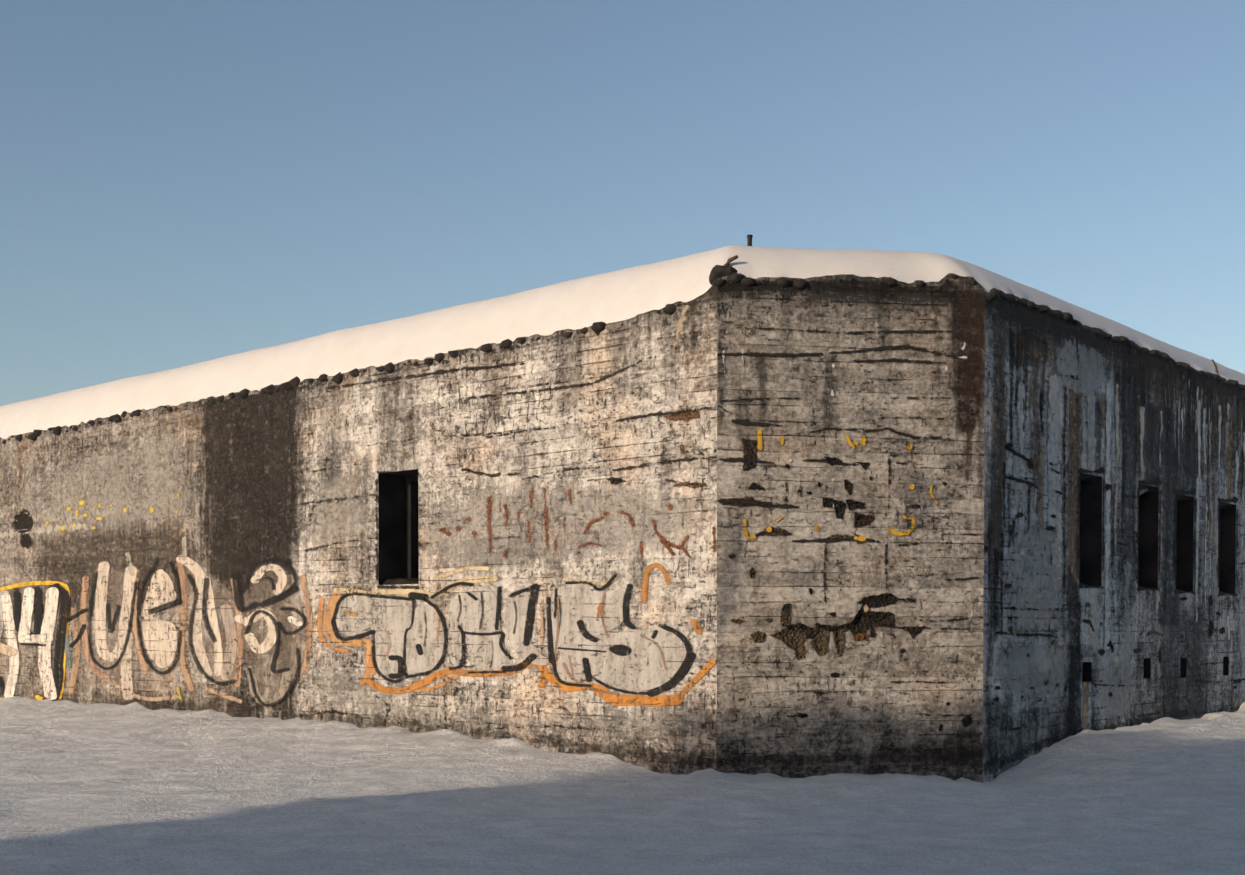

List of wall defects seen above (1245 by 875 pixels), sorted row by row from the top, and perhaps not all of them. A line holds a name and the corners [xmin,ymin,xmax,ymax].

water stain [673,305,689,351]
spalling [665,410,700,421]
water stain [0,384,309,720]
spalling [718,439,765,507]
spalling [759,526,792,537]
spalling [798,479,875,544]
water stain [689,280,1245,774]
corrosion [988,314,1056,647]
corrosion [1066,367,1094,605]
spalling [731,593,925,660]